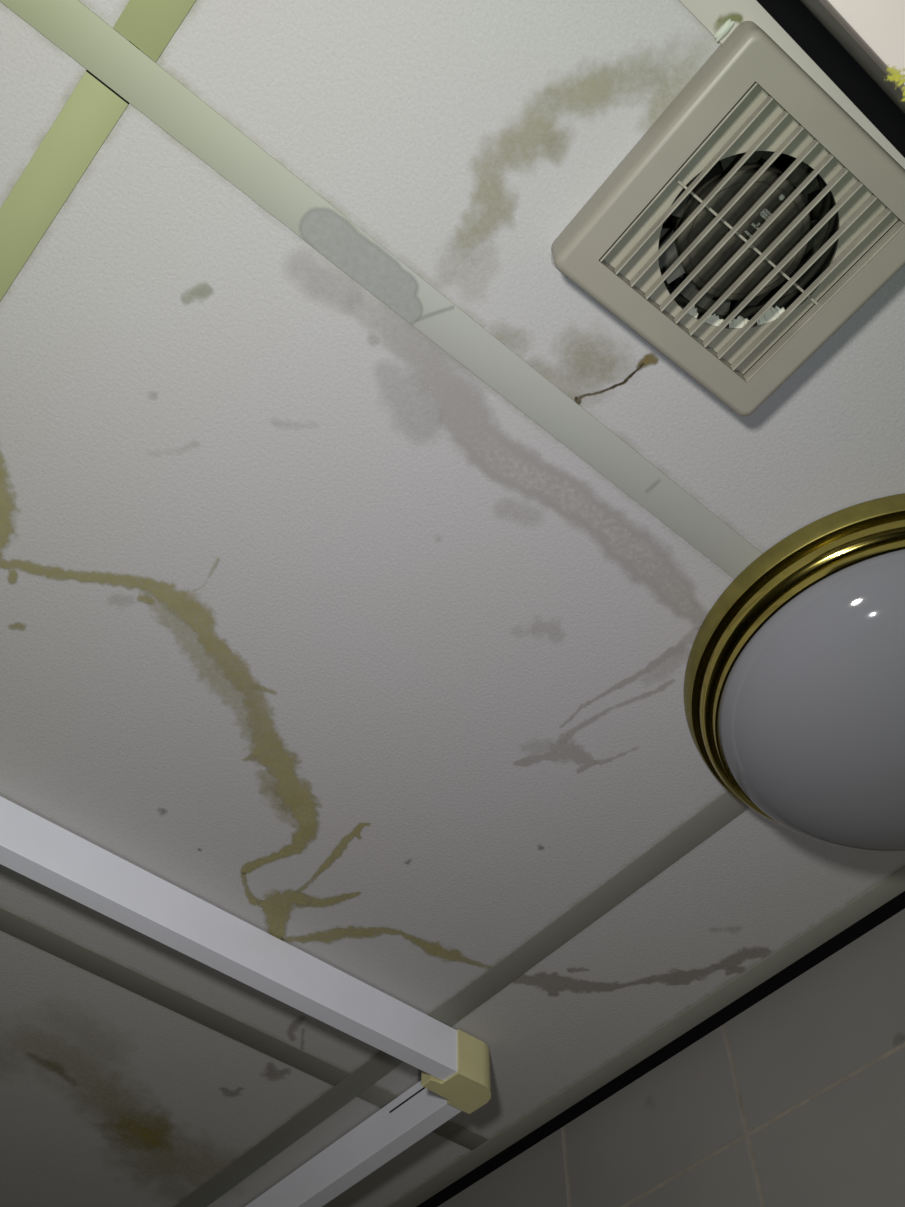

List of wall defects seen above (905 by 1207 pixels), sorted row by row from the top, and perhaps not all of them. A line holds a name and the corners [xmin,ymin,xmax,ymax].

water stain [718,14,742,25]
water stain [300,209,450,323]
water stain [409,341,706,624]
water stain [0,456,489,968]
water stain [515,641,689,773]
water stain [513,948,770,996]